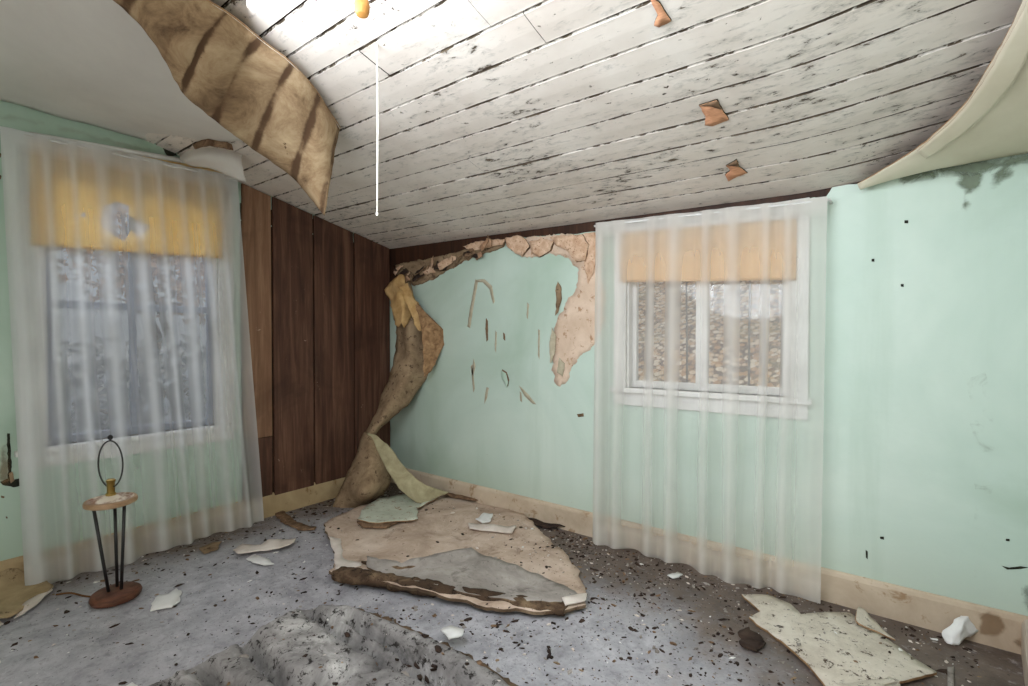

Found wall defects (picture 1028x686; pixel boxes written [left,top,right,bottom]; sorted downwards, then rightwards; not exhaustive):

peeling [651,0,671,27]
peeling [699,99,729,126]
peeling [163,139,247,182]
peeling [725,159,748,181]
damp [900,154,1028,206]
spalling [393,232,606,387]
peeling [471,359,489,404]
peeling [501,369,536,404]
spalling [1,433,19,487]